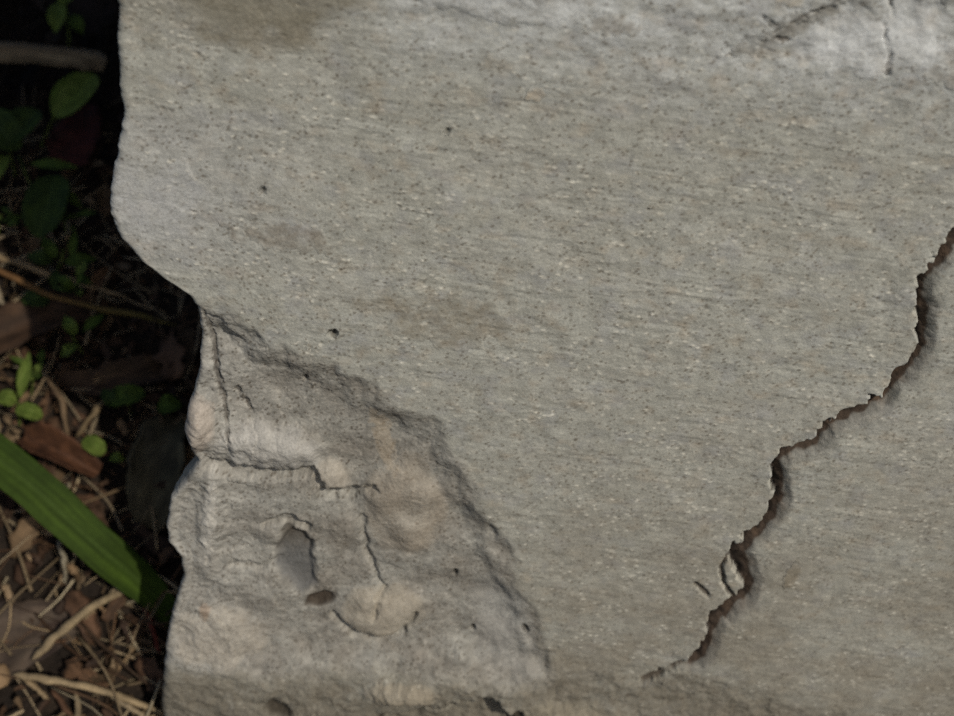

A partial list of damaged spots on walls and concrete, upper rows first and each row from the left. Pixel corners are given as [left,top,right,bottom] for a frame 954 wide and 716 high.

crack [730,0,894,75]
crack [918,0,954,9]
crack [640,227,954,683]
spalling [165,301,557,701]
spalling [256,697,299,716]